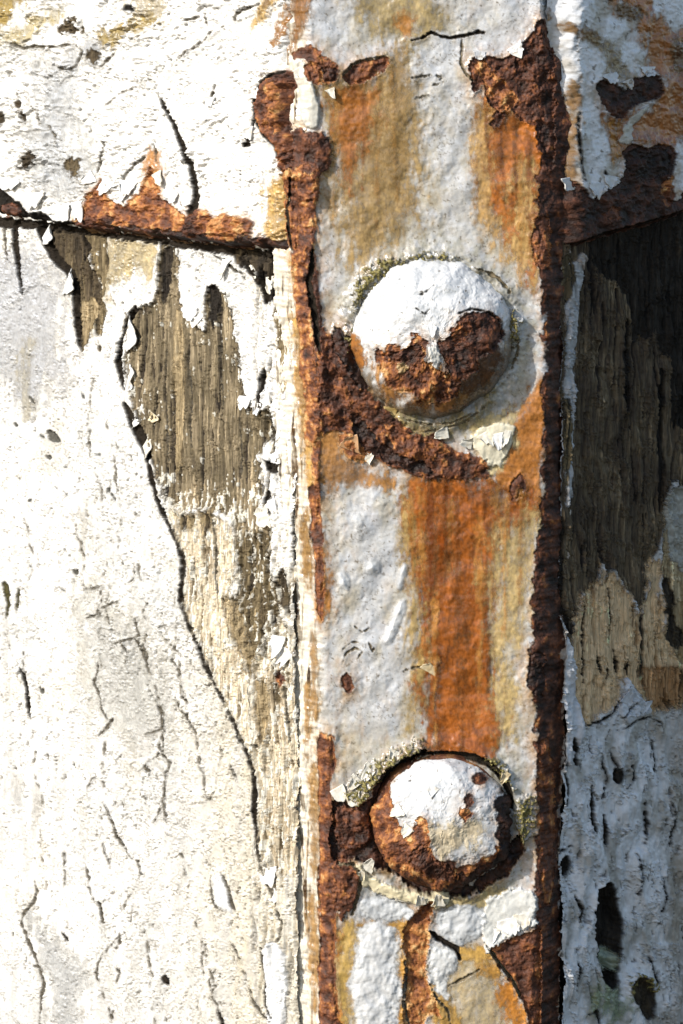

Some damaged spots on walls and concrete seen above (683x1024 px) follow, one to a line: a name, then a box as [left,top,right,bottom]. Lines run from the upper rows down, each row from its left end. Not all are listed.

crack [2,476,33,618]
crack [13,305,283,1024]
peeling [0,150,301,903]
corrosion [73,0,545,623]
corrosion [303,632,322,743]
corrosion [304,732,525,1024]
corrosion [387,0,683,1024]
peeling [557,212,683,807]